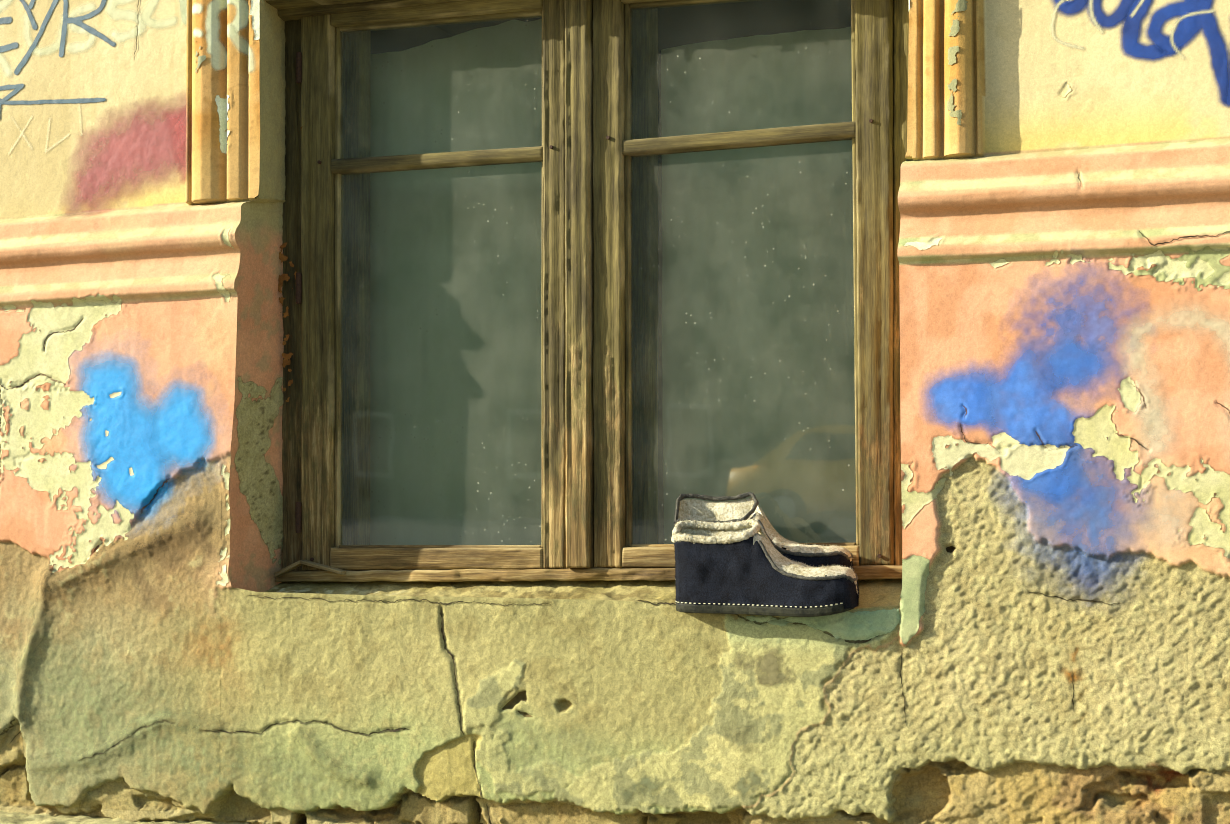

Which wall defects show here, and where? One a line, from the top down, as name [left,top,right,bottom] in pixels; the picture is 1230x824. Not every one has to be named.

peeling [249,0,260,40]
peeling [947,0,968,125]
peeling [215,95,230,153]
peeling [1108,246,1230,291]
crack [1139,231,1230,246]
crack [0,318,83,470]
crack [141,478,170,514]
spalling [0,294,293,823]
spalling [498,376,1230,824]
crack [79,720,409,761]
crack [249,595,551,824]
spalling [393,735,482,824]